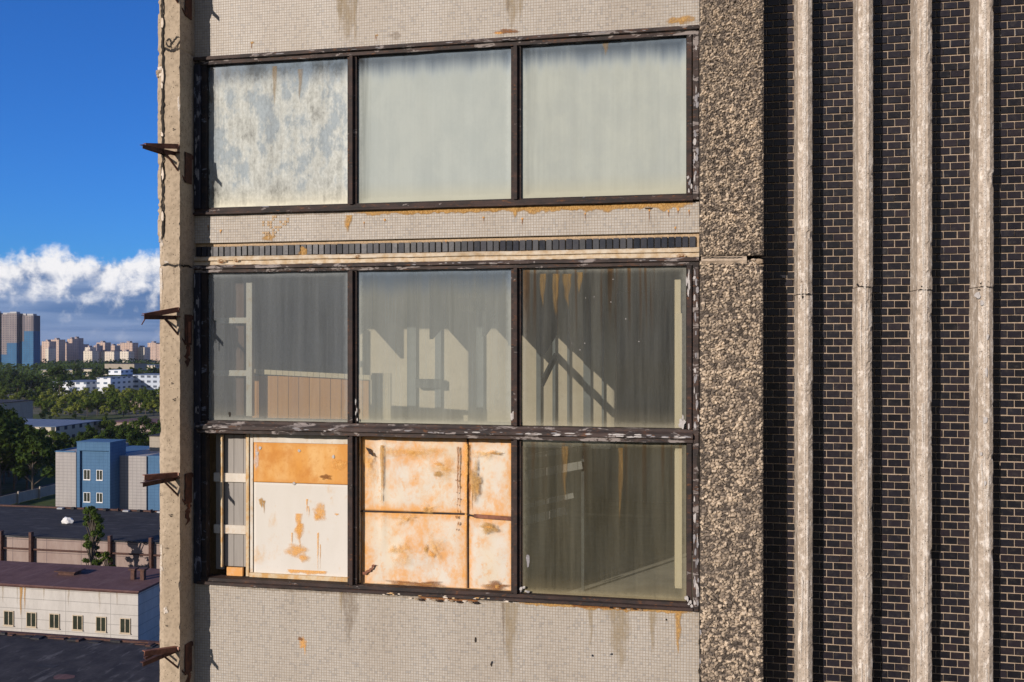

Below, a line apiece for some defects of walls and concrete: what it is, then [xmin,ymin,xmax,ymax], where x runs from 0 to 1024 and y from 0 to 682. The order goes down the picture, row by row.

peeling [608,353,699,438]
corrosion [362,436,511,590]